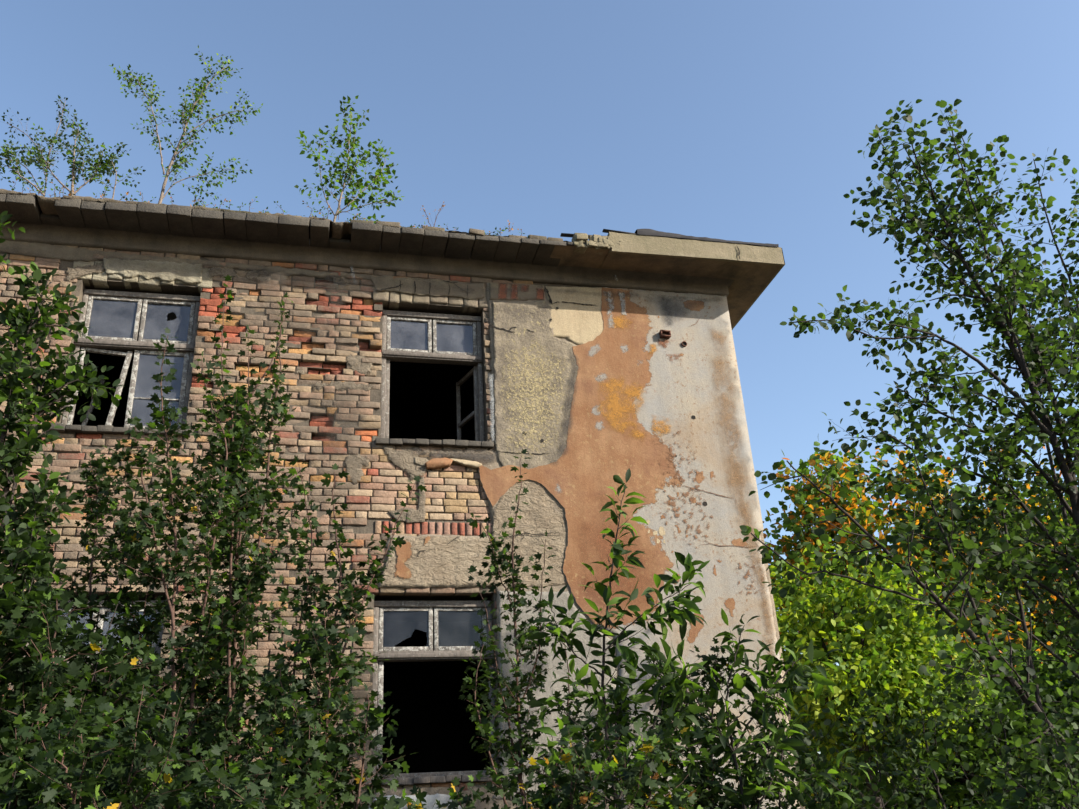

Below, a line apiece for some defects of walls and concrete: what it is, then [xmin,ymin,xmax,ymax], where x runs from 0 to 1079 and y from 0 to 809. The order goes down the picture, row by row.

spalling [0,193,586,267]
peeling [306,279,688,801]
peeling [687,614,704,643]